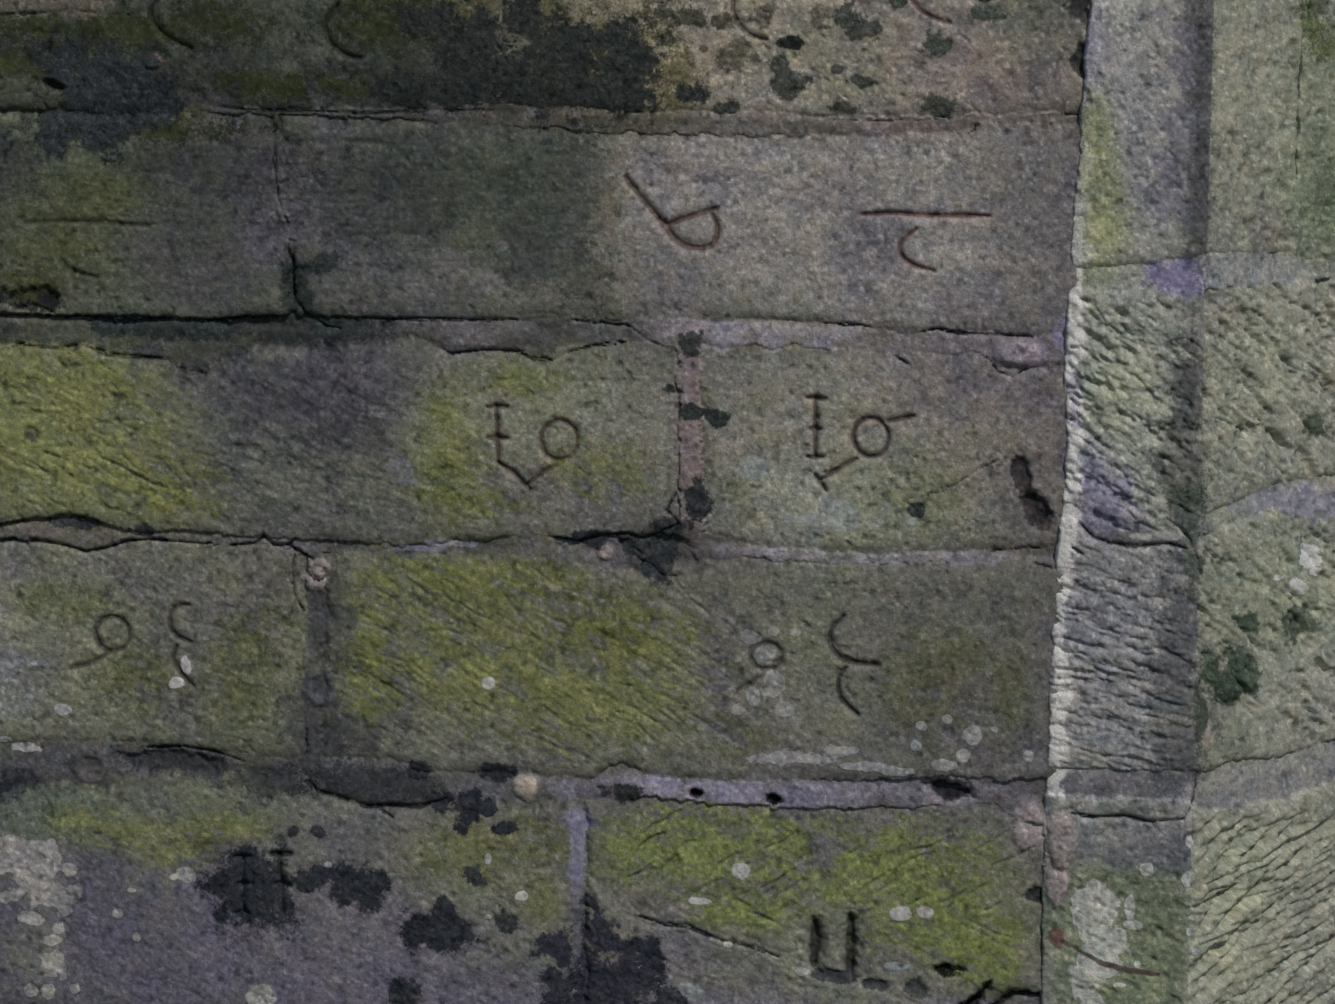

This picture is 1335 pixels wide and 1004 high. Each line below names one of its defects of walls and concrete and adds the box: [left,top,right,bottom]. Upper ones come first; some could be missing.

water stain [120,0,509,149]
spalling [1011,456,1053,531]
water stain [117,743,441,801]
crack [960,980,1039,1004]